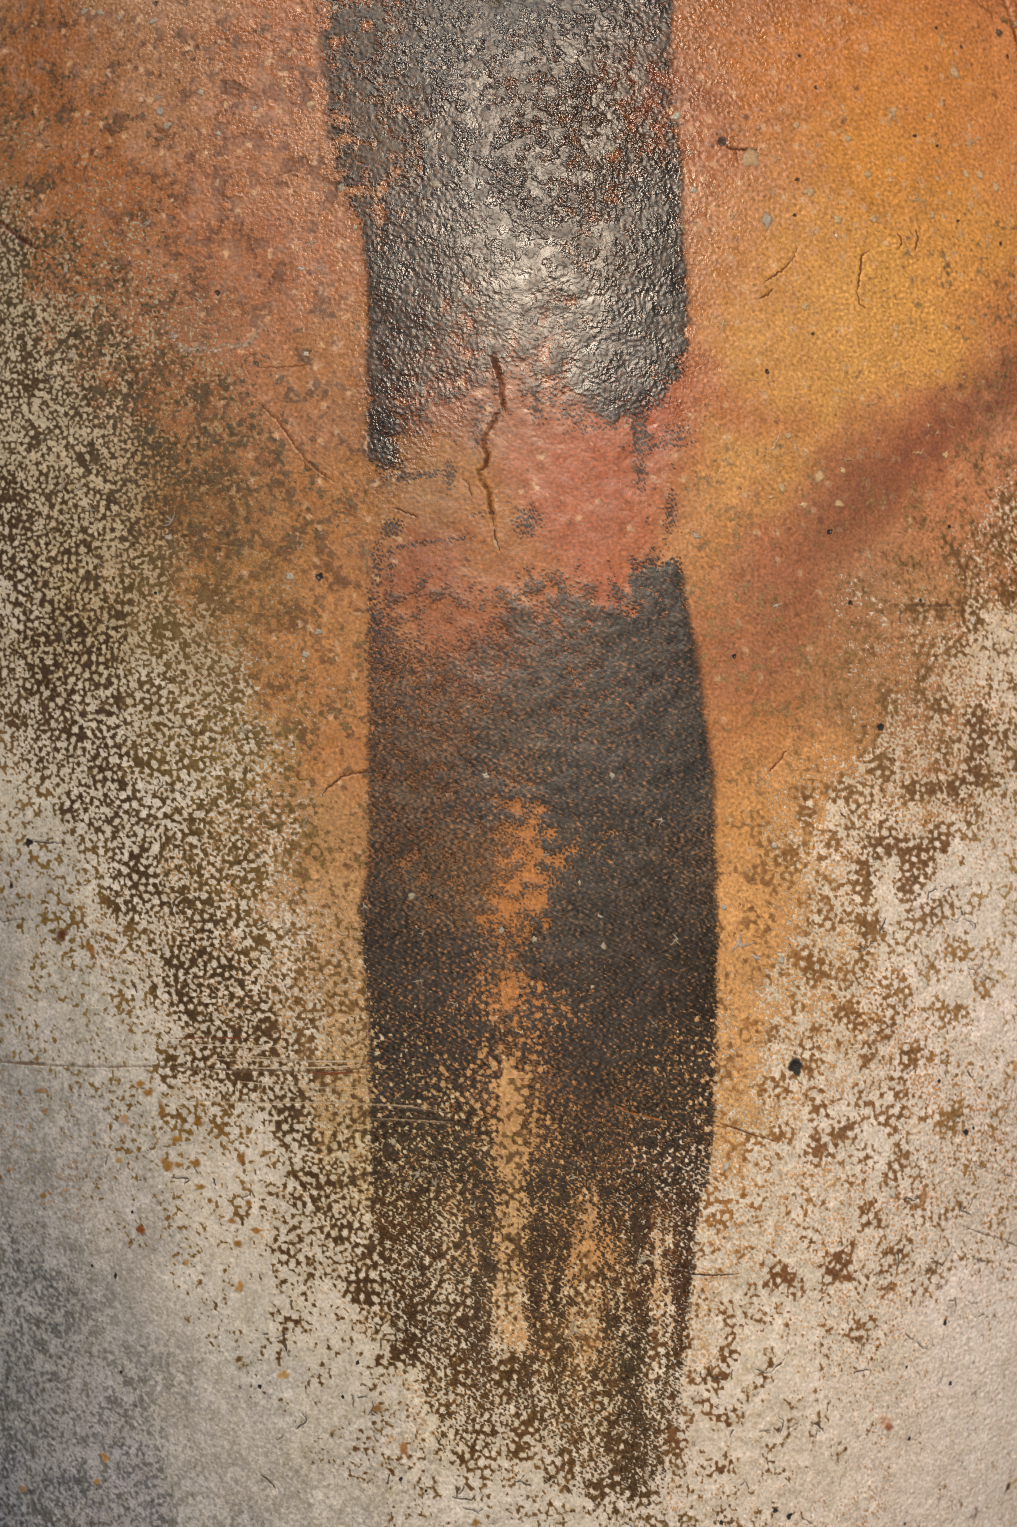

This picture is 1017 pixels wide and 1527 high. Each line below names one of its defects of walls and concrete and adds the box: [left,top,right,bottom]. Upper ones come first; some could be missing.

damp [317,0,690,483]
damp [928,250,1017,352]
crack [471,356,506,550]
damp [0,1008,62,1077]
rust [0,1059,100,1232]
damp [166,1237,204,1295]
damp [184,1265,234,1323]
damp [305,1338,340,1389]
damp [814,1309,896,1380]
damp [405,1469,442,1519]
rust [384,1373,521,1459]
damp [751,1390,803,1527]